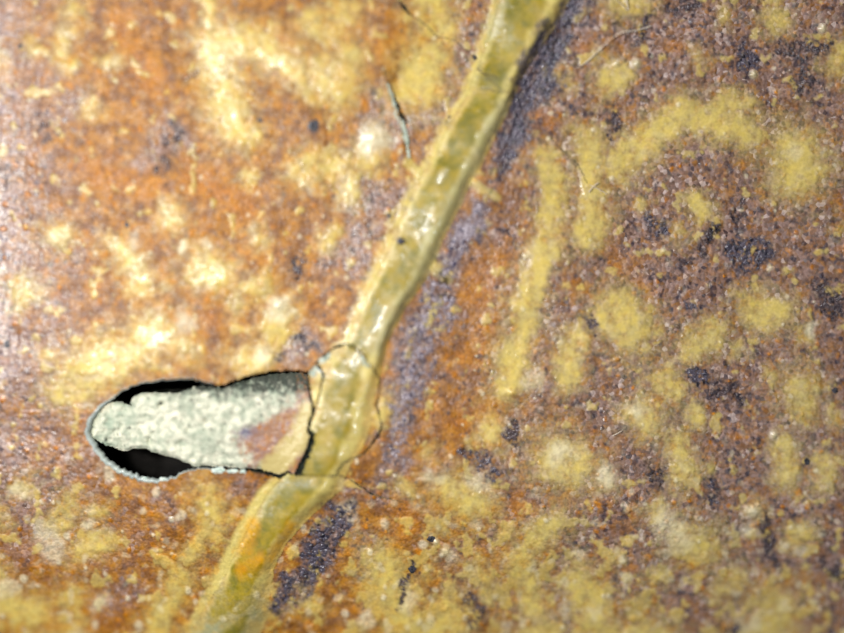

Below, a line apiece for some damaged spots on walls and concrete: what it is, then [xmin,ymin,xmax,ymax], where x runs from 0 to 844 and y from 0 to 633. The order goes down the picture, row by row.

spalling [84,344,381,484]
crack [248,343,406,504]